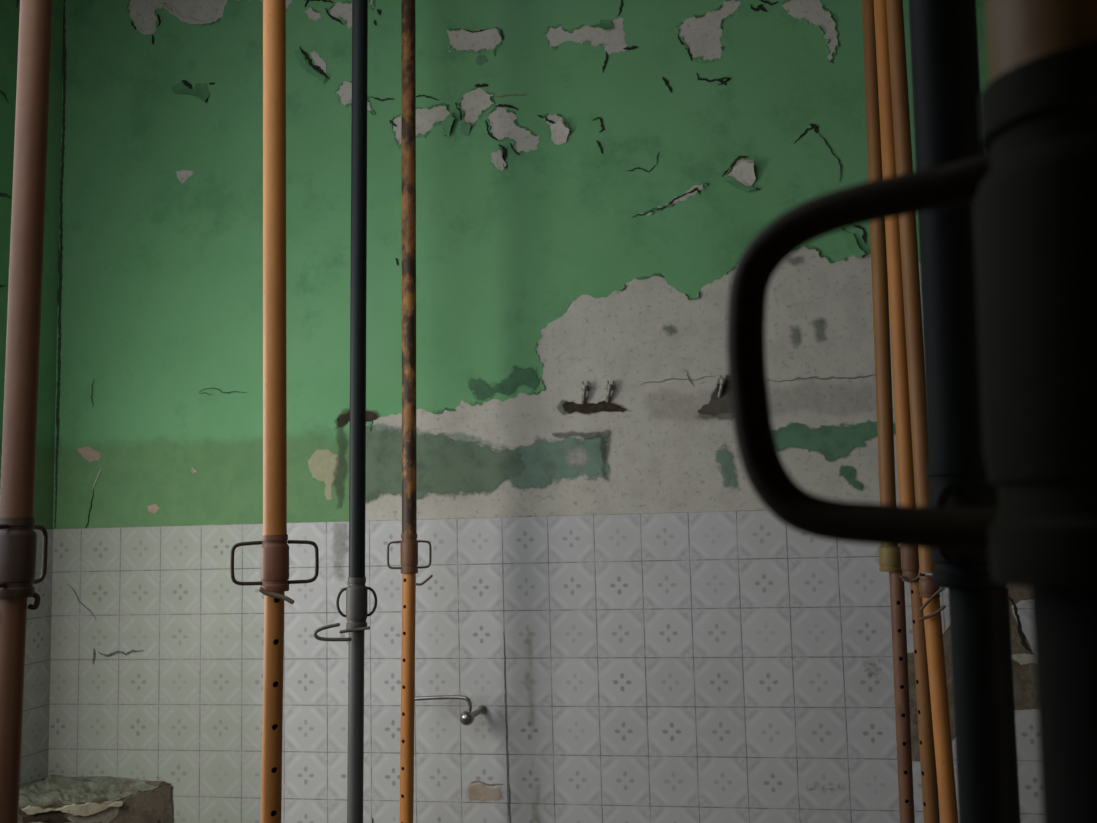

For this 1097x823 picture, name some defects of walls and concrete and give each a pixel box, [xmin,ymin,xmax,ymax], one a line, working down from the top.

peeling [126,0,263,45]
peeling [286,0,352,29]
peeling [541,0,638,73]
peeling [674,0,741,64]
peeling [416,83,572,171]
crack [794,124,842,179]
crack [633,187,700,217]
peeling [416,266,768,519]
peeling [765,230,880,504]
peeling [308,449,339,500]
peeling [365,492,402,521]
crack [503,633,511,823]